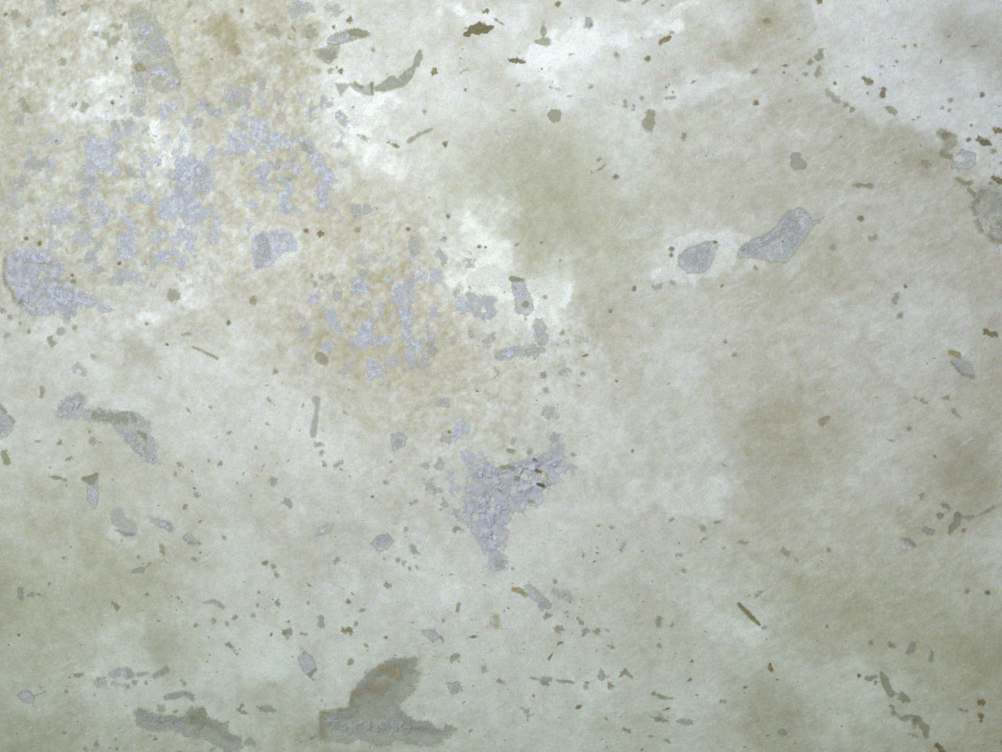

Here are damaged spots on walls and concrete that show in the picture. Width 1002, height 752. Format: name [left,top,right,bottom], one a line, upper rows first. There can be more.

spalling [356,50,422,91]
spalling [0,23,348,322]
spalling [669,241,718,273]
spalling [737,207,822,268]
peeling [308,227,447,381]
spalling [453,290,496,321]
spalling [57,392,157,464]
spalling [420,419,578,572]
spalling [135,683,243,752]